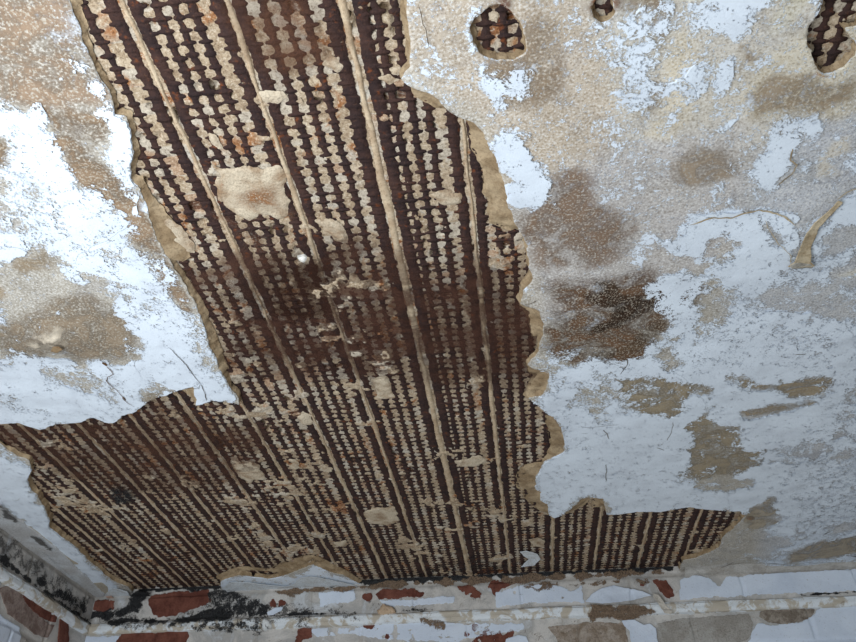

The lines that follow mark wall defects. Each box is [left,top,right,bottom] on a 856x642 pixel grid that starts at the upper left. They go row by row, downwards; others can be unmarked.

flaking render [464,4,535,119]
peeling [587,0,789,119]
flaking render [807,0,856,78]
water stain [0,0,191,312]
peeling [0,102,236,406]
water stain [523,171,623,266]
water stain [0,298,132,359]
water stain [544,272,699,365]
water stain [616,375,713,418]
peeling [533,186,856,518]
water stain [0,536,674,635]
peeling [488,569,856,642]